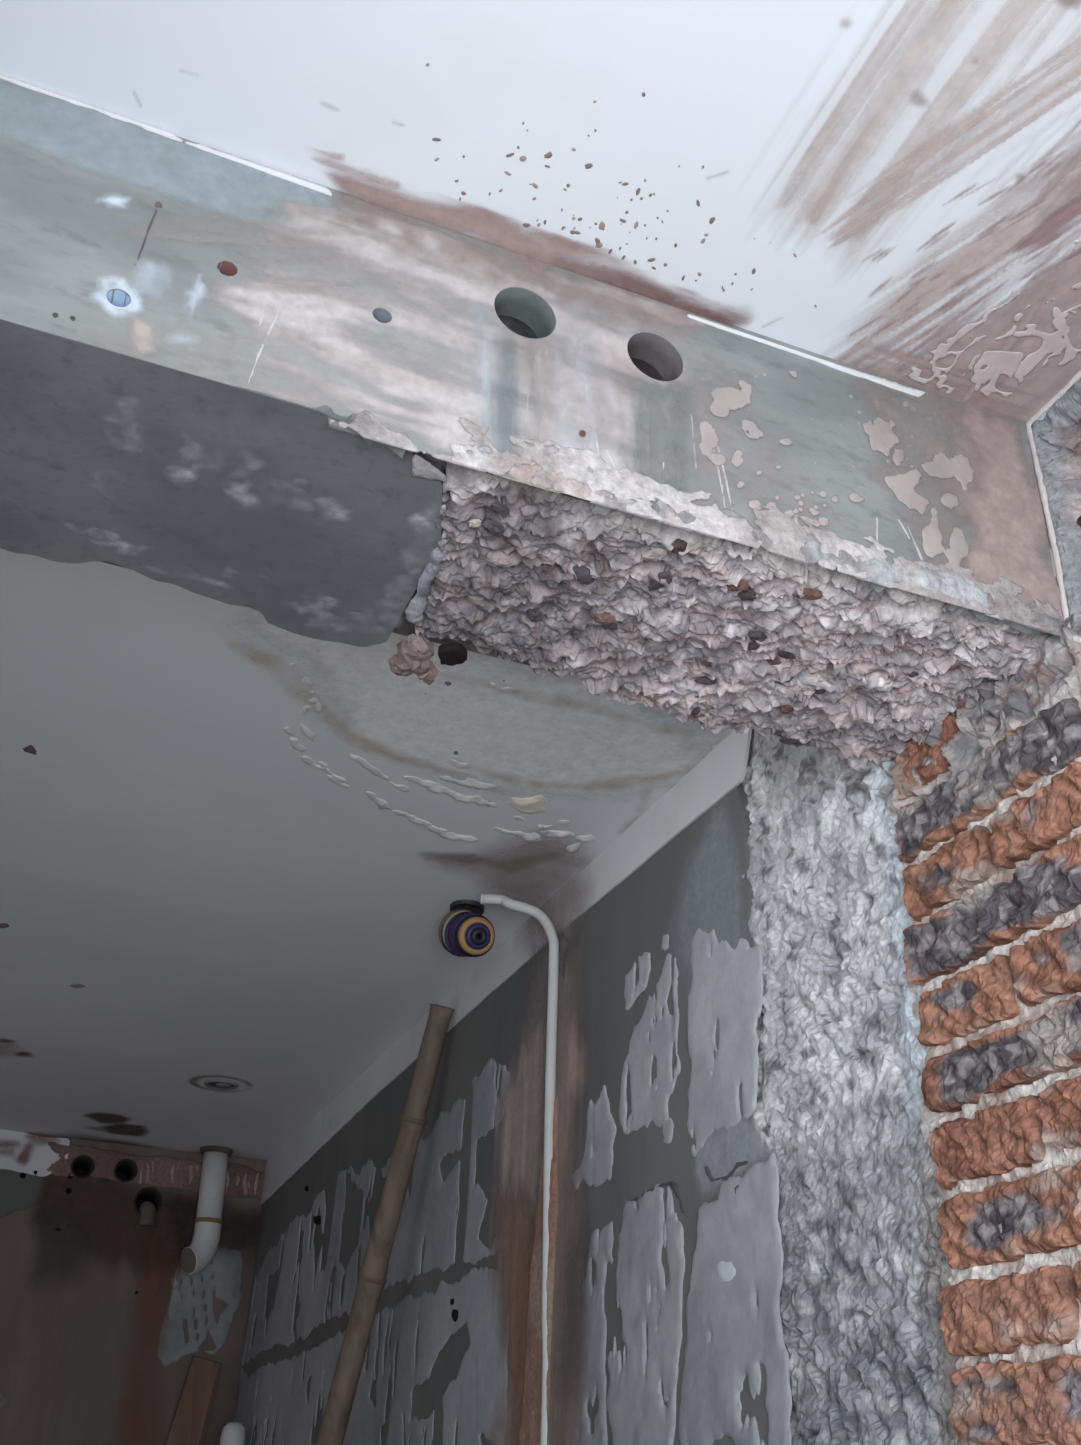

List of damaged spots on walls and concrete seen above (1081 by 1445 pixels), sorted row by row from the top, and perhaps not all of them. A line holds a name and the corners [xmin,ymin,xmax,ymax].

corrosion [323,154,739,325]
flaking render [245,282,1081,1445]
water stain [37,1175,198,1343]
water stain [219,1213,260,1249]
peeling [157,1155,392,1445]